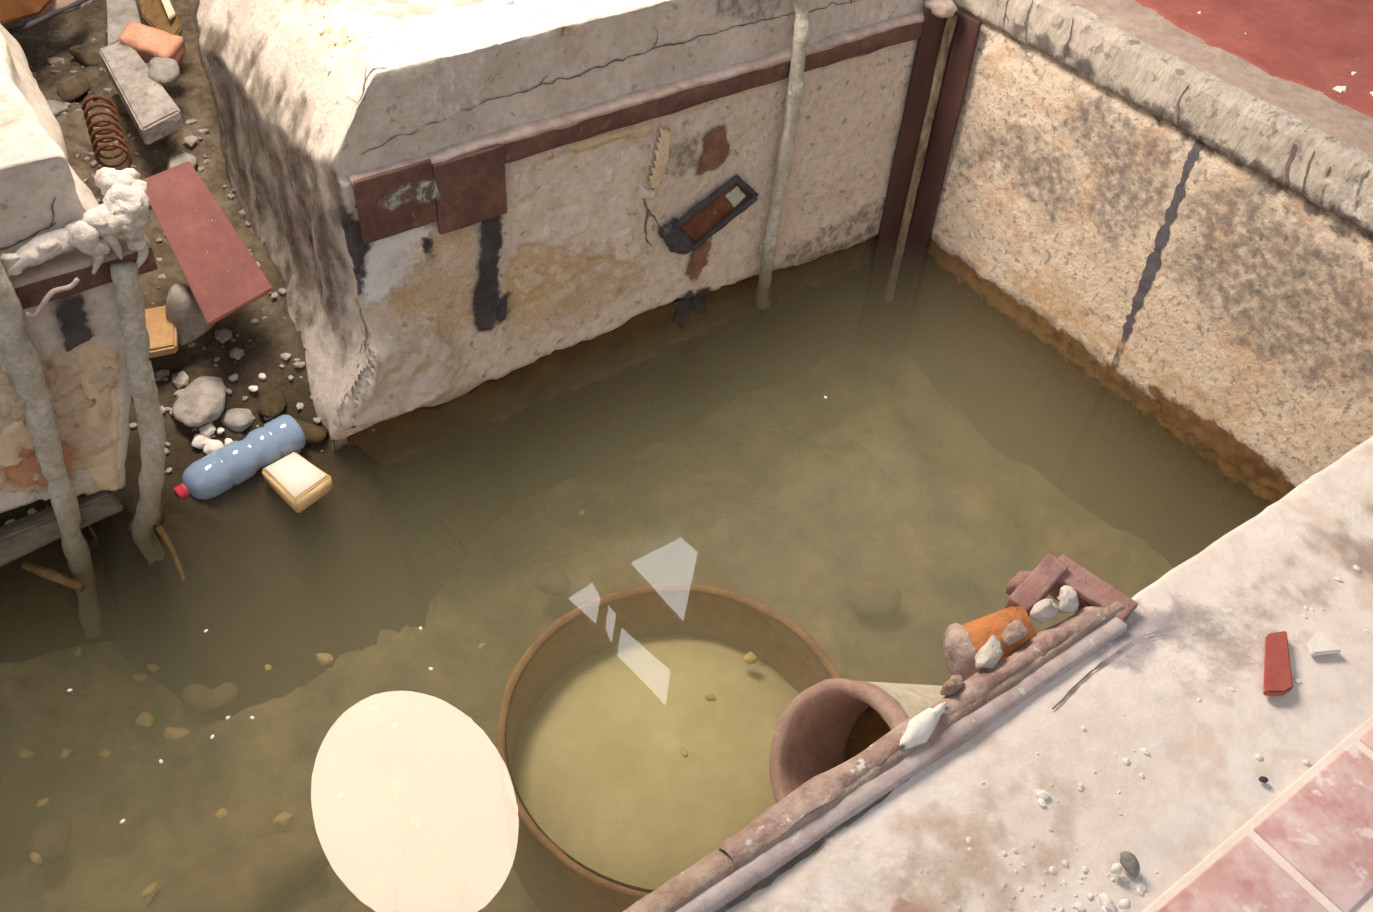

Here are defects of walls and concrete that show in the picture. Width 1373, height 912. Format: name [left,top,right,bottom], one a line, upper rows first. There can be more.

leakage [195,4,346,346]
peeling [361,226,433,308]
rust [669,126,730,176]
crack [1111,85,1204,370]
spalling [0,364,52,527]
spalling [41,341,120,493]
leakage [926,236,1296,503]